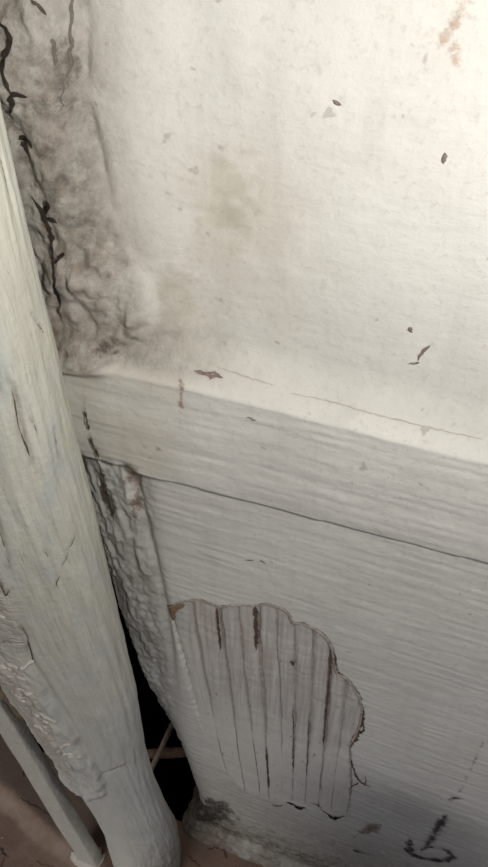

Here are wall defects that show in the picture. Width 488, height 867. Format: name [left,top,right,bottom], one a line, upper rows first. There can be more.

crack [31,0,47,15]
crack [0,23,27,114]
crack [51,0,74,106]
crack [19,135,32,159]
crack [31,196,65,311]
crack [194,366,272,385]
crack [291,393,481,439]
spalling [167,599,365,816]
water stain [197,798,239,824]